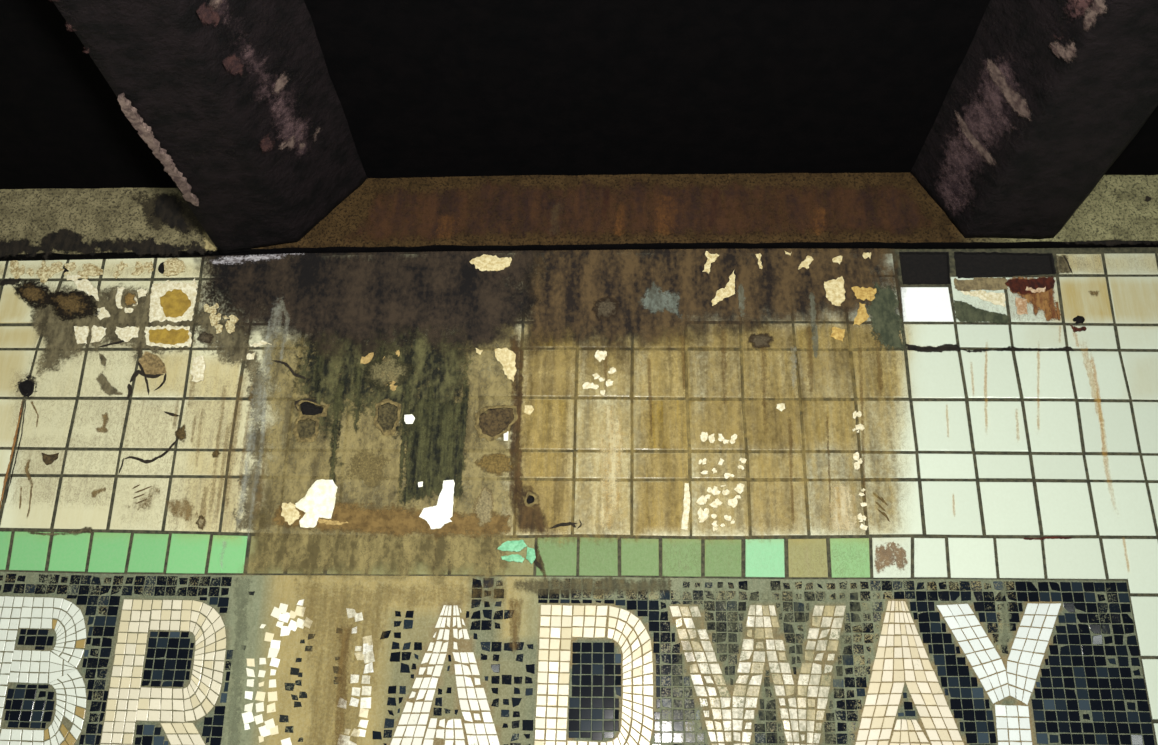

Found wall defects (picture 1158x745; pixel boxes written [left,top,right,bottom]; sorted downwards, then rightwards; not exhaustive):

damp [0,193,304,265]
peeling [10,260,103,284]
peeling [74,307,110,344]
peeling [116,261,239,375]
damp [642,282,680,314]
corrosion [1005,276,1086,332]
corrosion [0,400,26,508]
crack [99,340,179,475]
damp [249,294,895,578]
peeling [700,432,737,444]
peeling [281,502,301,525]
peeling [696,458,747,531]